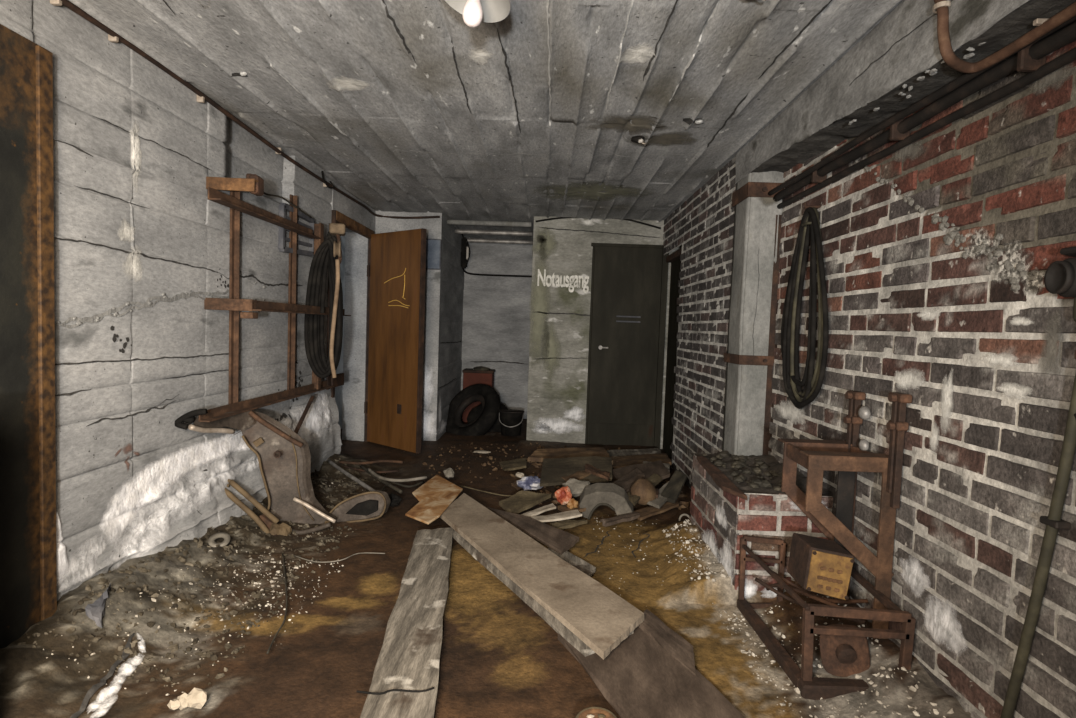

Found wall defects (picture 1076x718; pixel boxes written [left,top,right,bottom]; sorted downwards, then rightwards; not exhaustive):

crack [382,0,416,63]
crack [707,0,832,148]
crack [55,304,229,427]
leakage [284,395,331,438]
leakage [56,431,259,589]